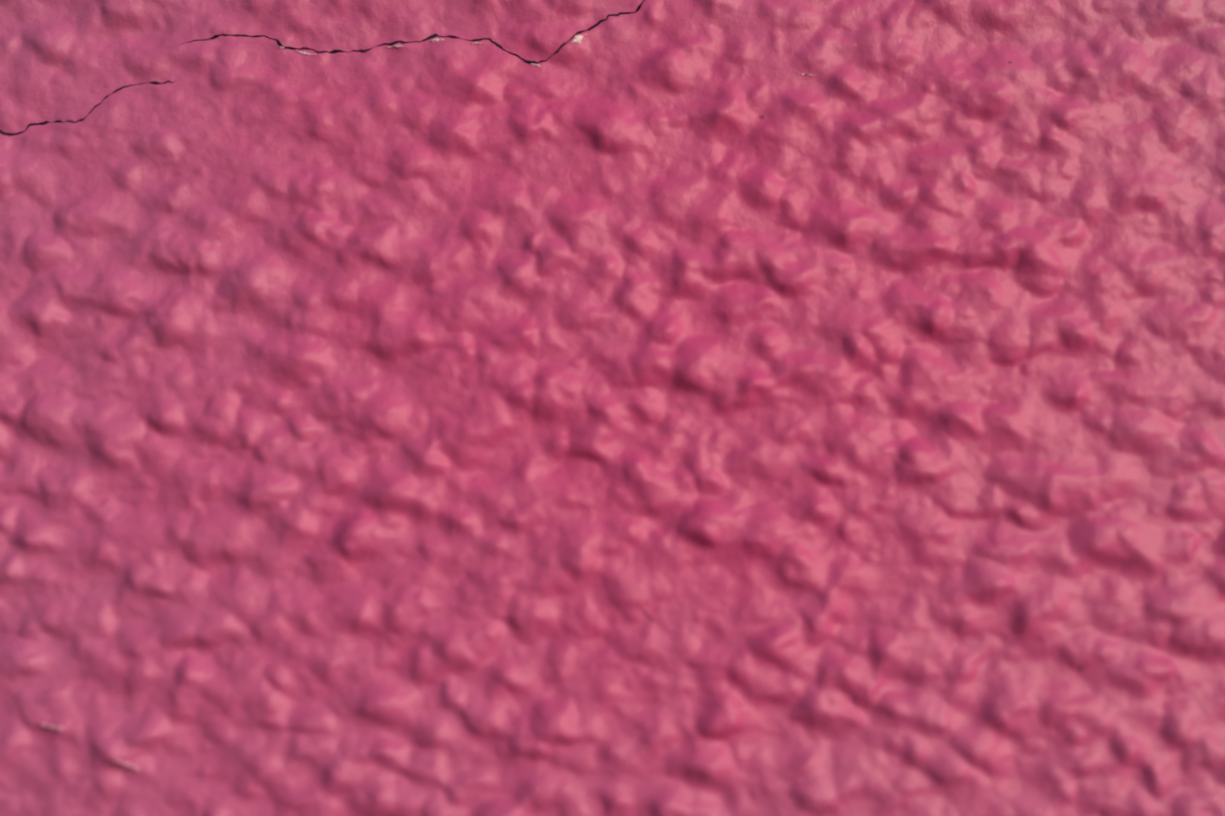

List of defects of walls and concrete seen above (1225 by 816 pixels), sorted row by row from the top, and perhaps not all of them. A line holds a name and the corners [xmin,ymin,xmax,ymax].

crack [180,0,645,67]
crack [0,80,177,136]